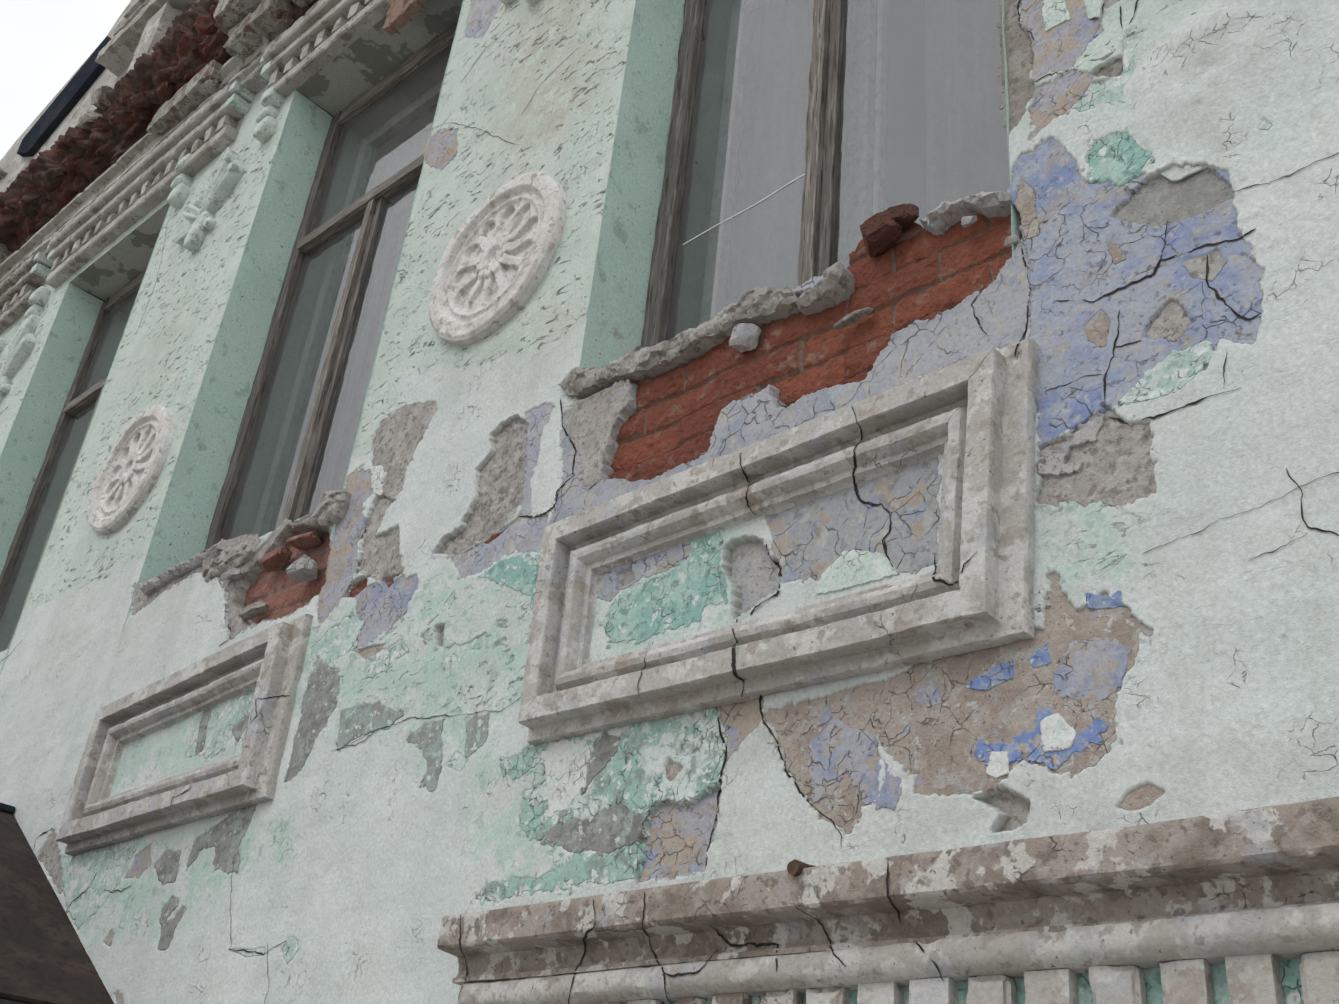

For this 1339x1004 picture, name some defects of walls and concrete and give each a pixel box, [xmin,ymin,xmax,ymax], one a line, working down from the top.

spalling [156,81,177,106]
crack [1234,152,1339,192]
spalling [439,0,1265,615]
crack [971,221,1260,424]
spalling [132,401,437,679]
peeling [597,457,942,649]
crack [1144,468,1339,561]
crack [706,455,842,866]
peeling [476,573,1153,906]
peeling [158,895,186,950]
crack [229,862,286,1004]
crack [568,875,779,1004]